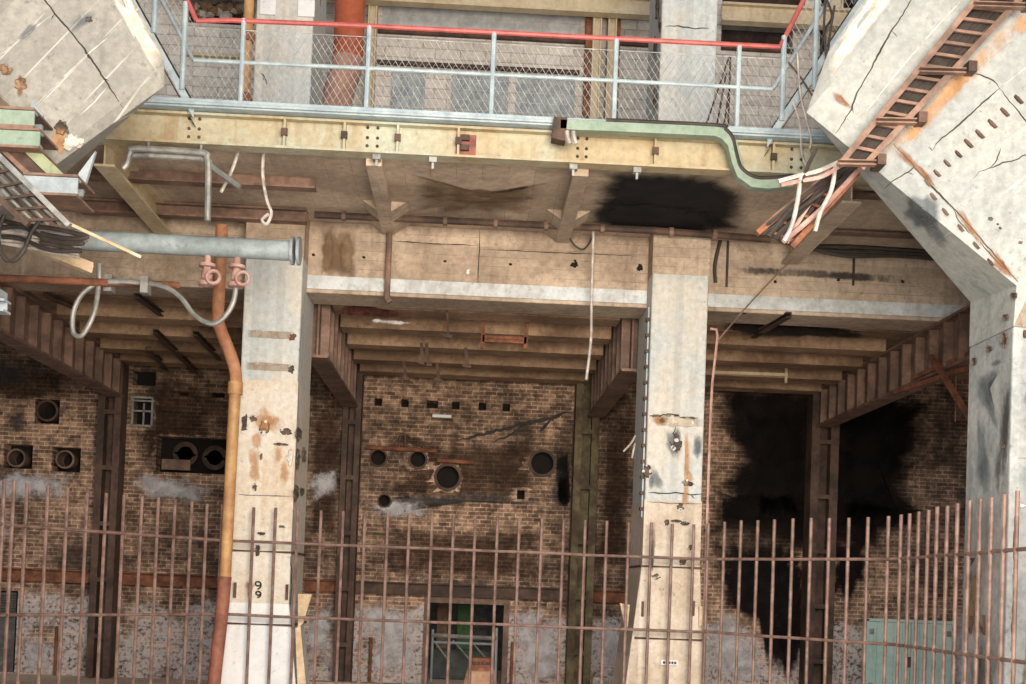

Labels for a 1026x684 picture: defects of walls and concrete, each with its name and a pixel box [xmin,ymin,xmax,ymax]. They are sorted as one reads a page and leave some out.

crack [44,0,123,108]
crack [836,0,911,133]
spalling [54,119,85,152]
water stain [423,177,532,211]
water stain [596,204,731,231]
rust [903,153,932,183]
crack [885,73,1026,282]
rust [995,255,1011,275]
rust [251,412,275,477]
spalling [241,413,307,470]
peeling [649,413,698,451]
water stain [774,561,802,671]